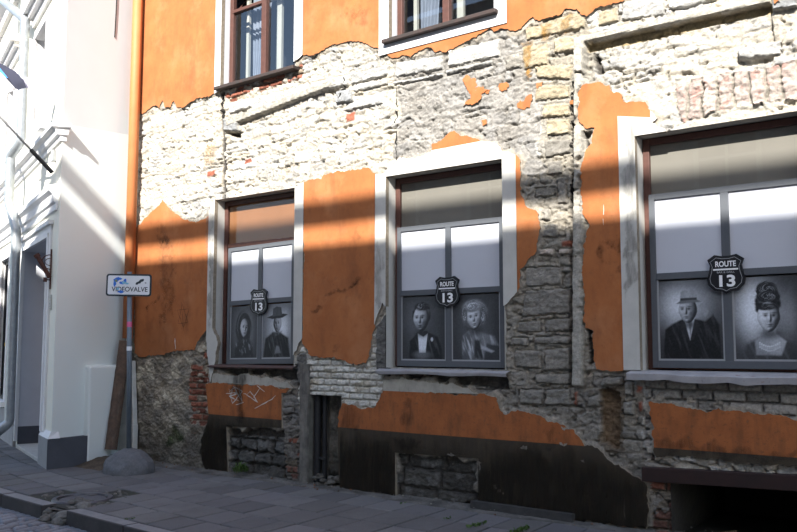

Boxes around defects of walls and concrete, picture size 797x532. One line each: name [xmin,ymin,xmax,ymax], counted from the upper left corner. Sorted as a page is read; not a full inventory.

spalling [132,0,797,482]
damp [340,443,393,495]
spalling [644,481,672,532]